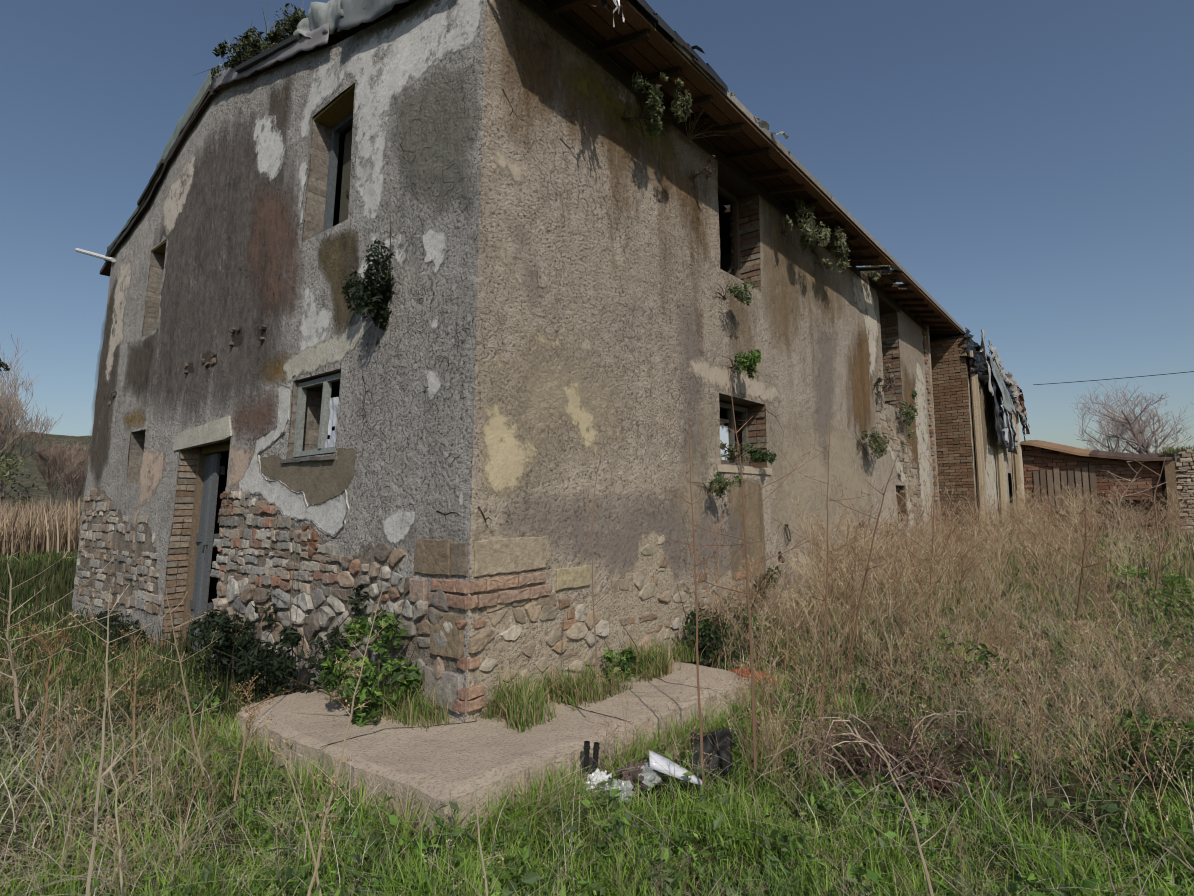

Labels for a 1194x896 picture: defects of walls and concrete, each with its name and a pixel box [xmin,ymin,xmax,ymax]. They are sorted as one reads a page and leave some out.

flaking render [253,116,285,181]
leakage [269,76,291,142]
flaking render [298,0,482,278]
leakage [506,19,700,236]
flaking render [162,155,195,235]
leakage [90,125,297,482]
flaking render [217,287,379,558]
flaking render [480,404,536,493]
flaking render [562,381,619,455]
flaking render [383,510,416,543]
flaking render [428,570,587,630]
flaking render [452,684,487,713]